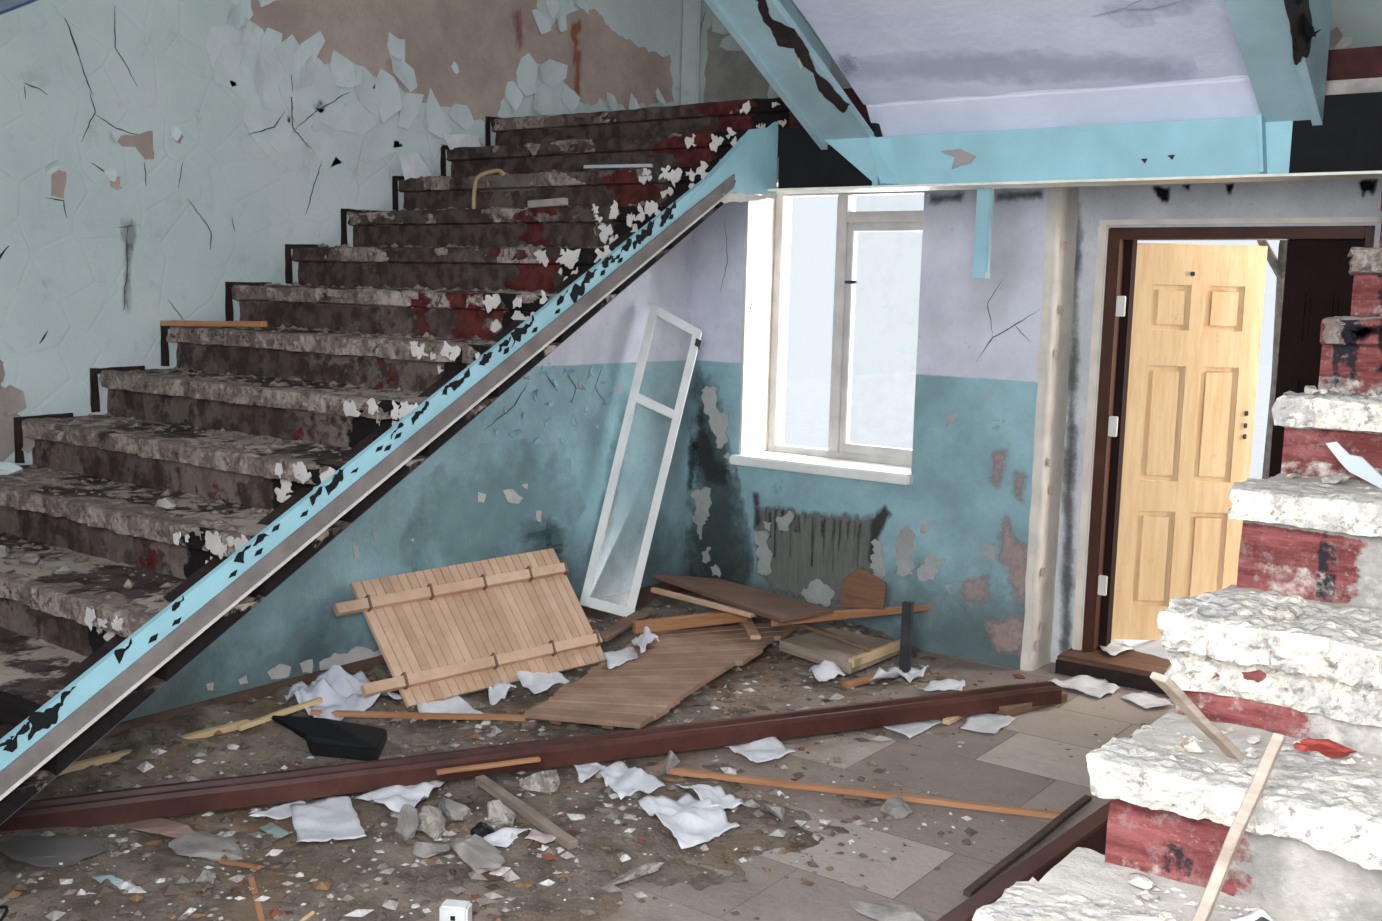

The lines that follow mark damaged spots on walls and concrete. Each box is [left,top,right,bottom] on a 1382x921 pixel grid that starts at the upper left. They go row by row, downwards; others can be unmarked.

peeling [756,0,850,113]
crack [64,7,235,250]
crack [249,75,348,213]
crack [119,225,130,307]
spalling [99,0,790,452]
crack [976,279,1040,362]
spalling [0,360,359,578]
spalling [1271,386,1382,433]
spalling [0,686,76,752]
spalling [1157,590,1382,727]
spalling [1086,725,1382,870]
spalling [972,872,1186,921]